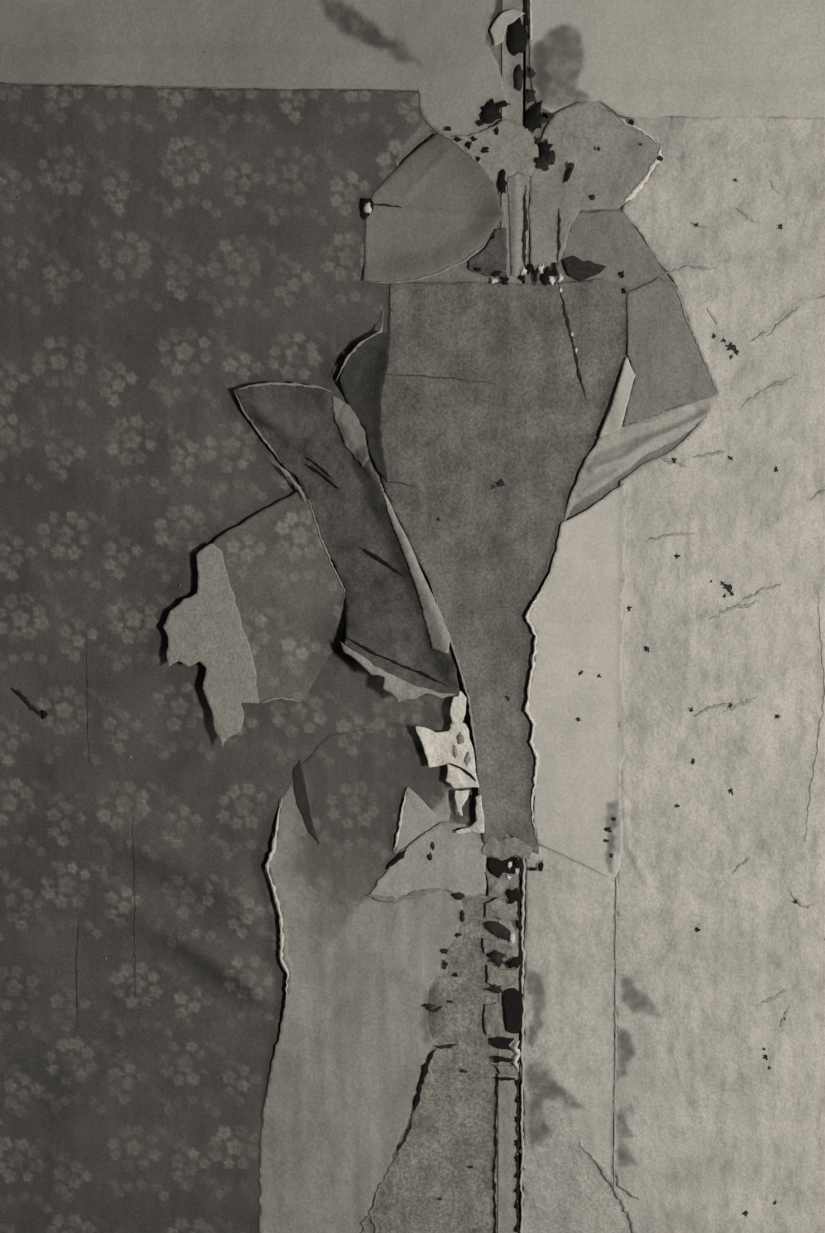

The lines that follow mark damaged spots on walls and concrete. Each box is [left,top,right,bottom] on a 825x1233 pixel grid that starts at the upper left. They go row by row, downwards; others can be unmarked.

water stain [327,6,405,59]
spalling [490,9,574,183]
spalling [445,98,510,162]
spalling [497,169,507,195]
spalling [468,228,626,294]
spalling [362,855,632,1233]
crack [579,1142,640,1233]